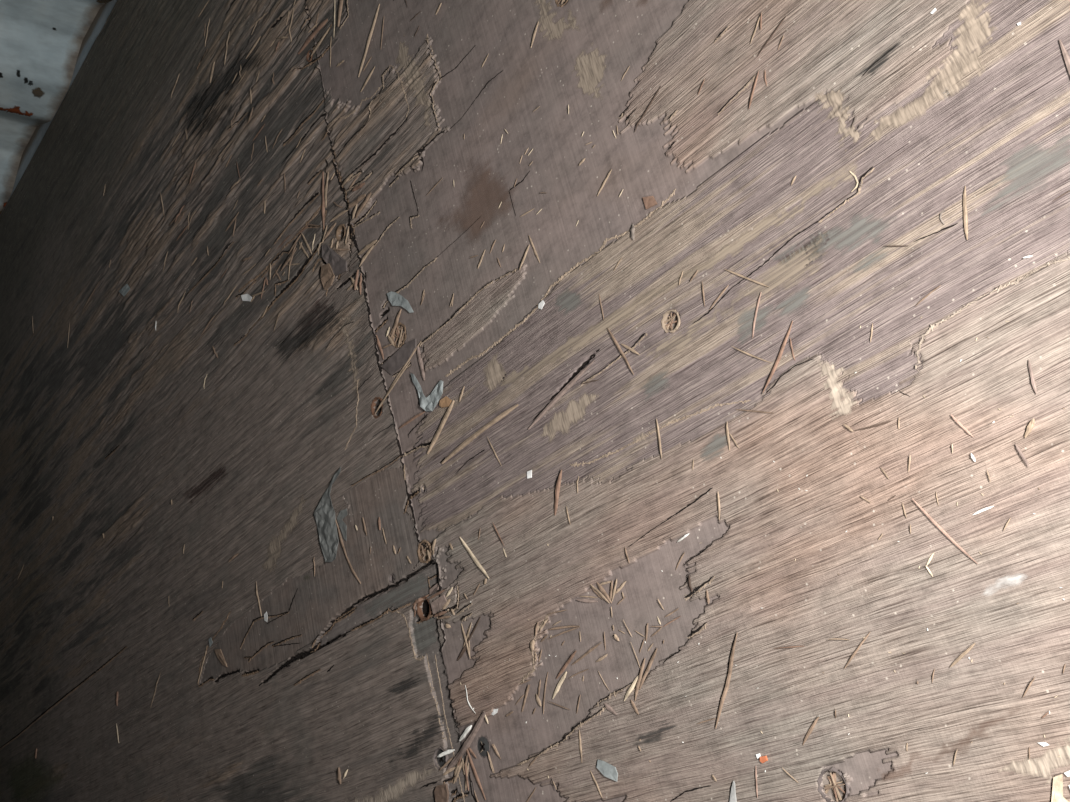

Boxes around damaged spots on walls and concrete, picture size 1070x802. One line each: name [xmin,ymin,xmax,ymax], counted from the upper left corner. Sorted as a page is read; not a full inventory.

corrosion [0,106,33,117]
peeling [201,0,816,802]
crack [199,560,472,687]